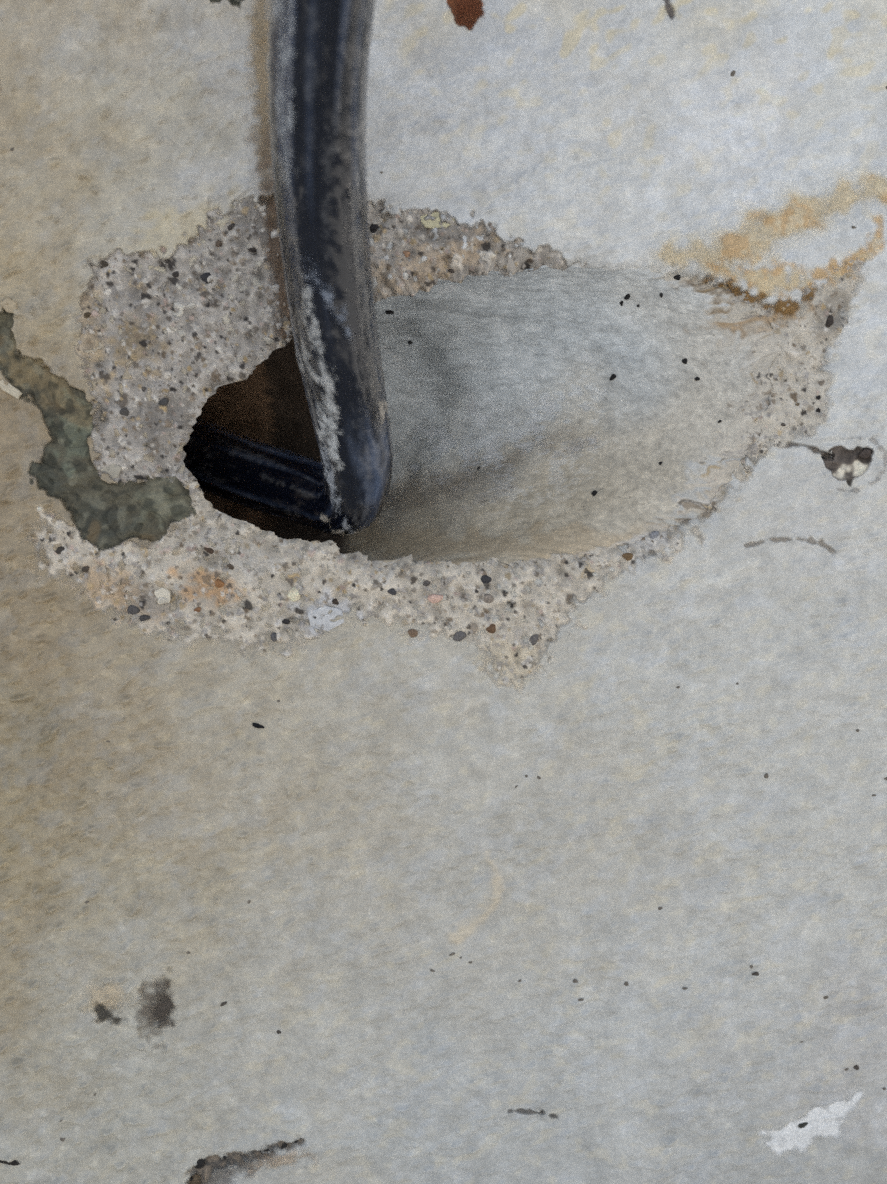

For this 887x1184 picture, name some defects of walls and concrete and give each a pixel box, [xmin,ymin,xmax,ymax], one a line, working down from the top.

corrosion [447,0,483,30]
spalling [0,194,865,689]
peeling [823,446,873,486]
crack [189,1138,304,1184]